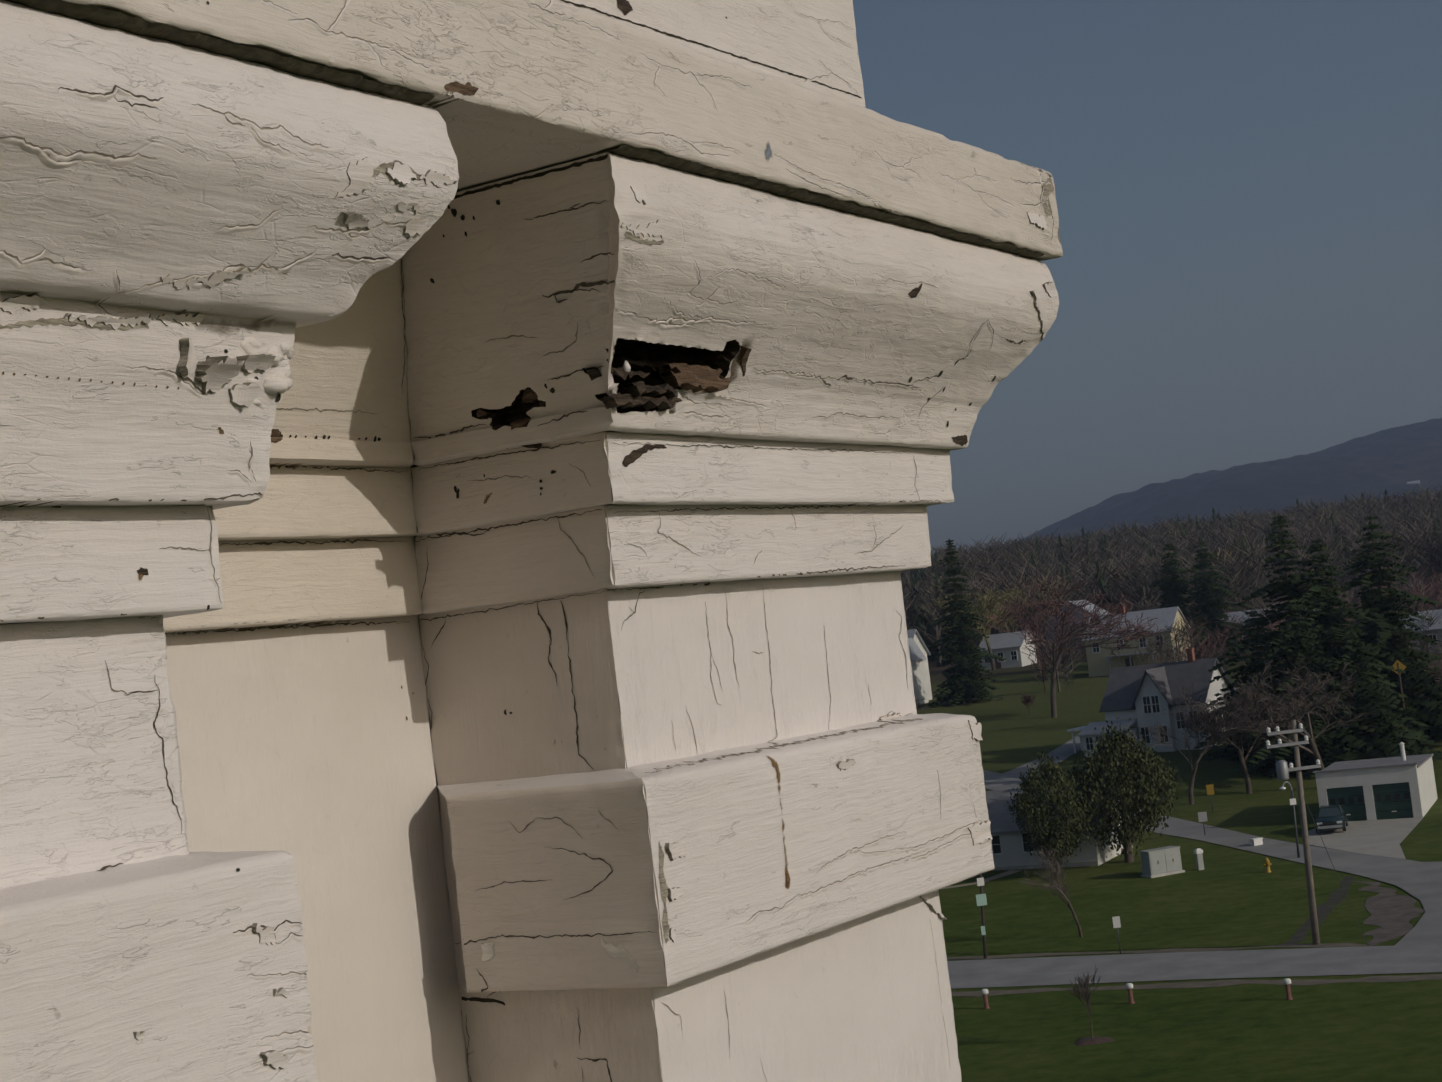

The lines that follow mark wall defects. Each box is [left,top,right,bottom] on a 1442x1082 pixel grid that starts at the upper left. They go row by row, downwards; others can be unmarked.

crack [58,85,329,157]
peeling [333,157,457,229]
peeling [0,293,295,411]
crack [0,208,417,414]
peeling [608,383,619,414]
crack [486,252,787,380]
spalling [622,444,667,467]
peeling [670,392,744,412]
peeling [740,346,751,376]
crack [559,460,927,748]
crack [105,661,182,832]
crack [456,931,653,1082]